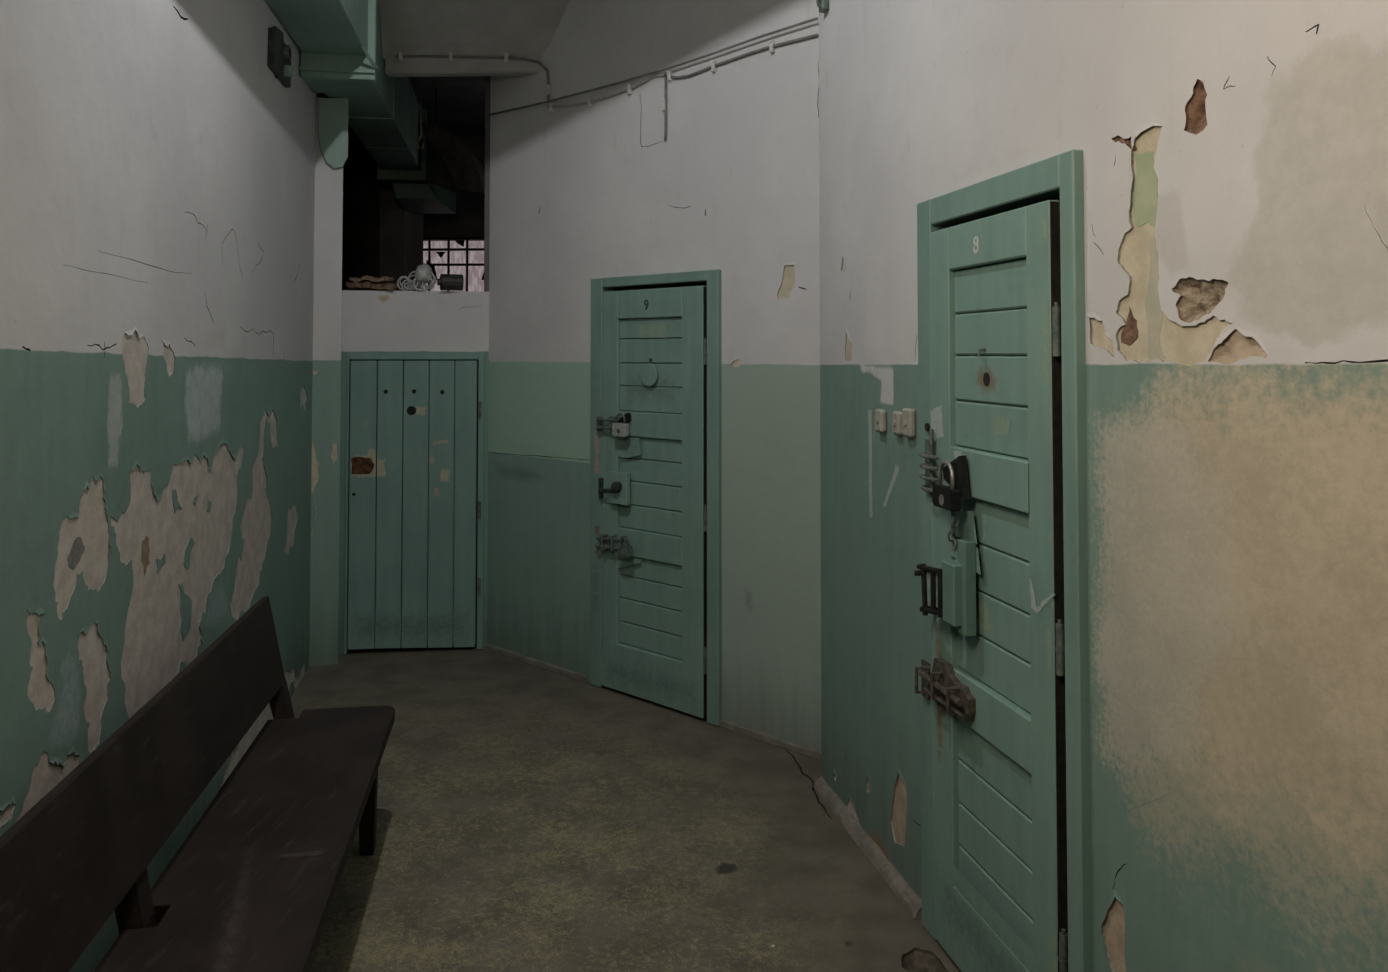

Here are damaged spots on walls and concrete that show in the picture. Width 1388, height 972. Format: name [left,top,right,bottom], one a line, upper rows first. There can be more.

flaking render [1184,79,1208,135]
peeling [776,262,795,299]
peeling [122,327,176,408]
rust [351,457,374,474]
peeling [1086,121,1388,972]
peeling [0,408,386,827]
peeling [889,767,907,846]